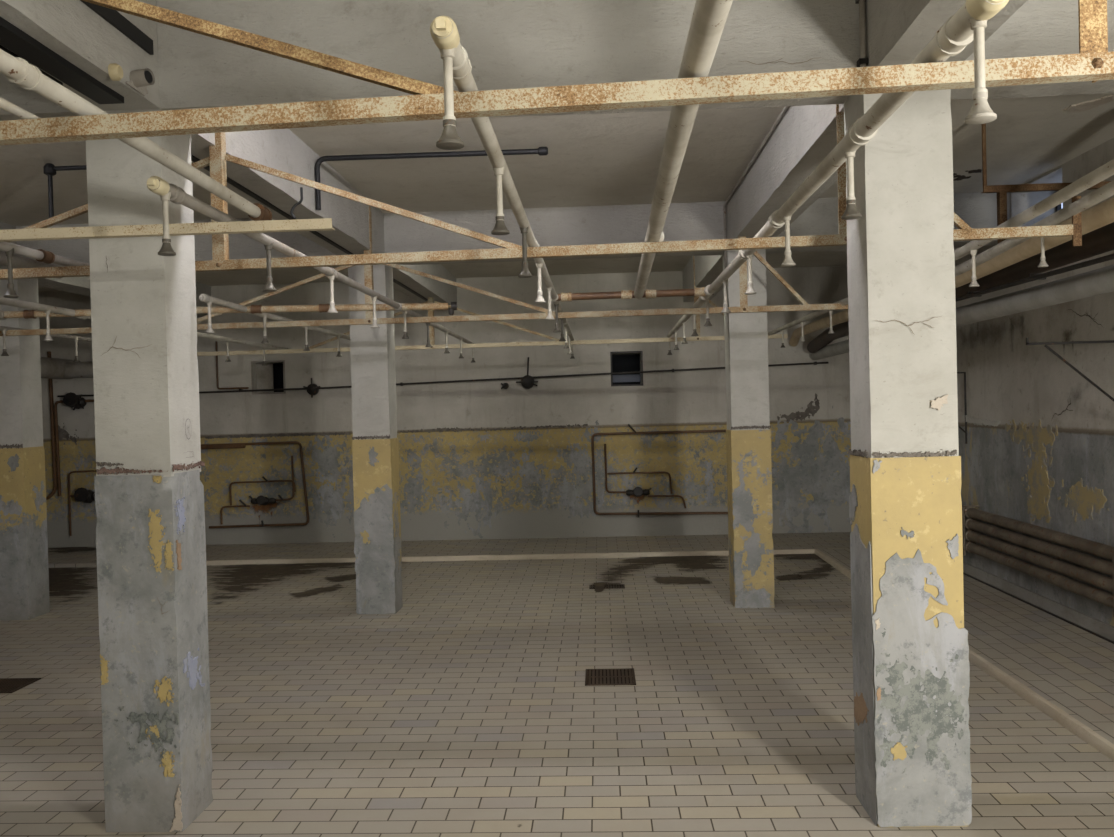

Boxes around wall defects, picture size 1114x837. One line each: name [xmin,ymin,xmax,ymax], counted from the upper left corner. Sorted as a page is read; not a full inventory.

peeling [0,444,23,472]
water stain [48,567,97,602]
peeling [96,461,205,484]
peeling [147,497,186,578]
peeling [205,420,607,614]
water stain [594,555,726,592]
peeling [701,458,771,608]
peeling [731,393,972,827]
peeling [1021,438,1109,524]
peeling [114,648,205,832]